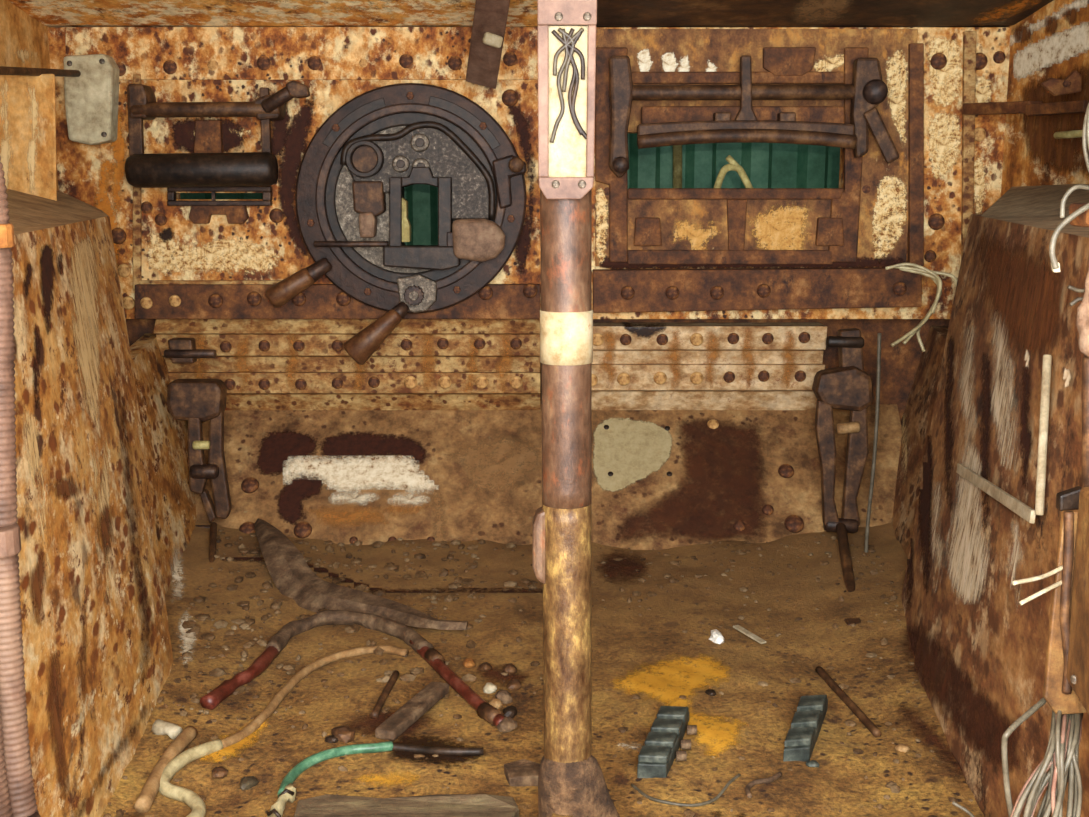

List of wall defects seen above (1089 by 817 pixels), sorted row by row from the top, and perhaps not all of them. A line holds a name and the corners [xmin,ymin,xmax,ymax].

rust [24,244,64,408]
rust [170,118,245,153]
rust [271,96,314,258]
rust [508,105,536,274]
rust [600,256,913,269]
rust [975,233,1069,489]
rust [31,548,46,625]
rust [56,476,81,499]
rust [97,506,113,558]
rust [118,392,150,678]
rust [178,614,196,664]
rust [49,652,69,799]